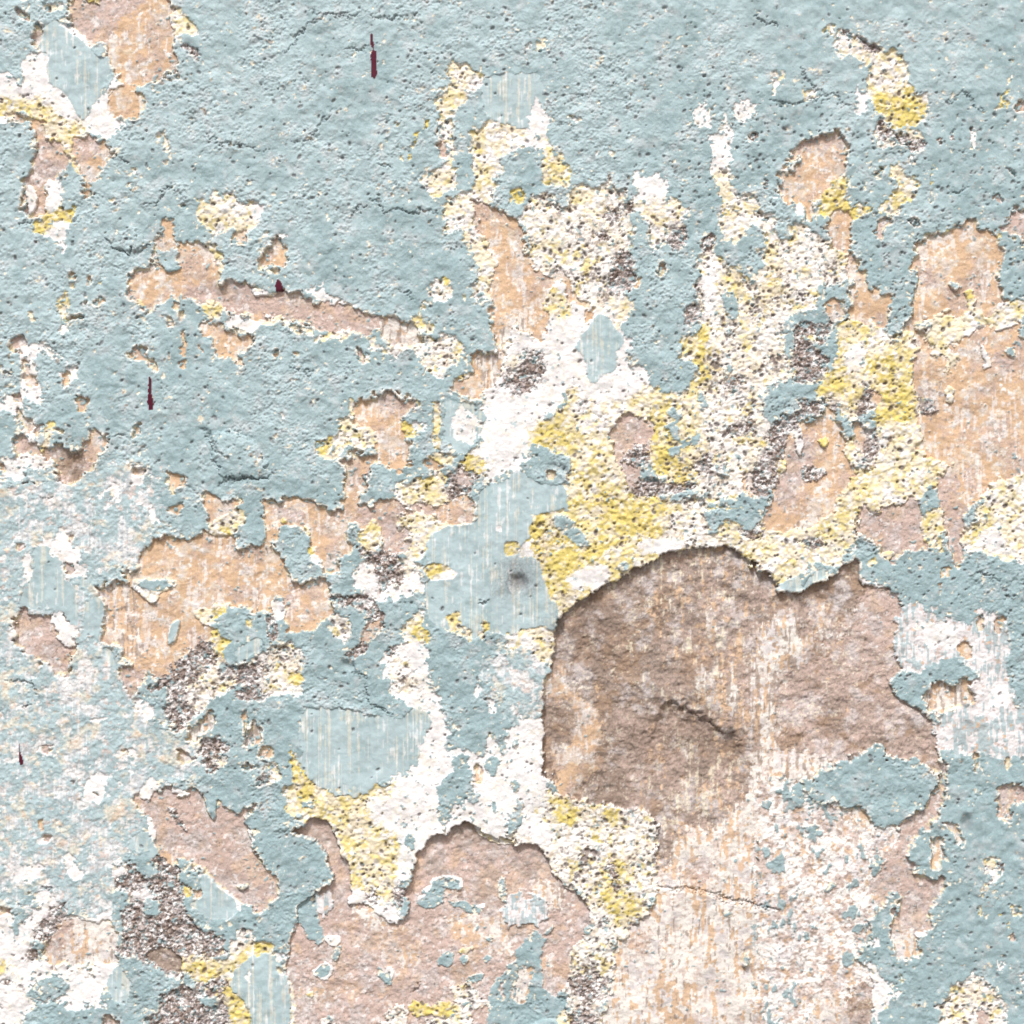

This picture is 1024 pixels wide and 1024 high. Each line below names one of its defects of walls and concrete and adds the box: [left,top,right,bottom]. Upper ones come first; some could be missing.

peeling [0,0,201,252]
peeling [693,100,712,130]
peeling [730,94,763,122]
peeling [771,70,785,95]
peeling [822,24,930,167]
peeling [981,60,1024,114]
peeling [0,61,691,1024]
flaking render [229,113,1024,1024]